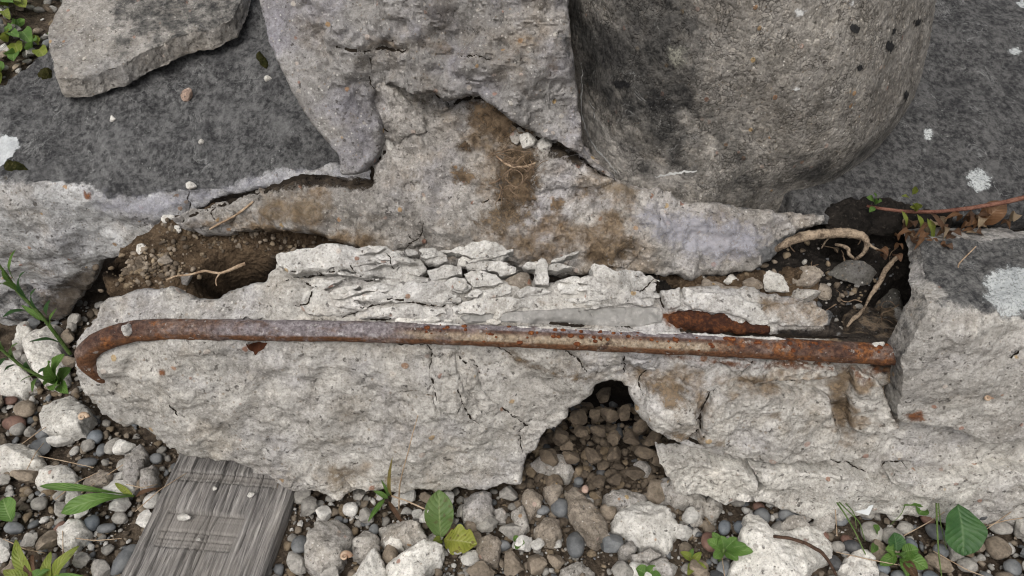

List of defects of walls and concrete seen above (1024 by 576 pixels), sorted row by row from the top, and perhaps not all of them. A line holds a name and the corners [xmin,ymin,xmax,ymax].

spalling [519,132,614,193]
spalling [161,206,236,233]
spalling [276,230,833,327]
spalling [226,311,265,320]
corrosion [74,310,896,384]
spalling [430,347,498,423]
crack [502,407,528,452]
spalling [522,425,548,445]
spalling [271,463,351,501]
crack [830,459,916,478]